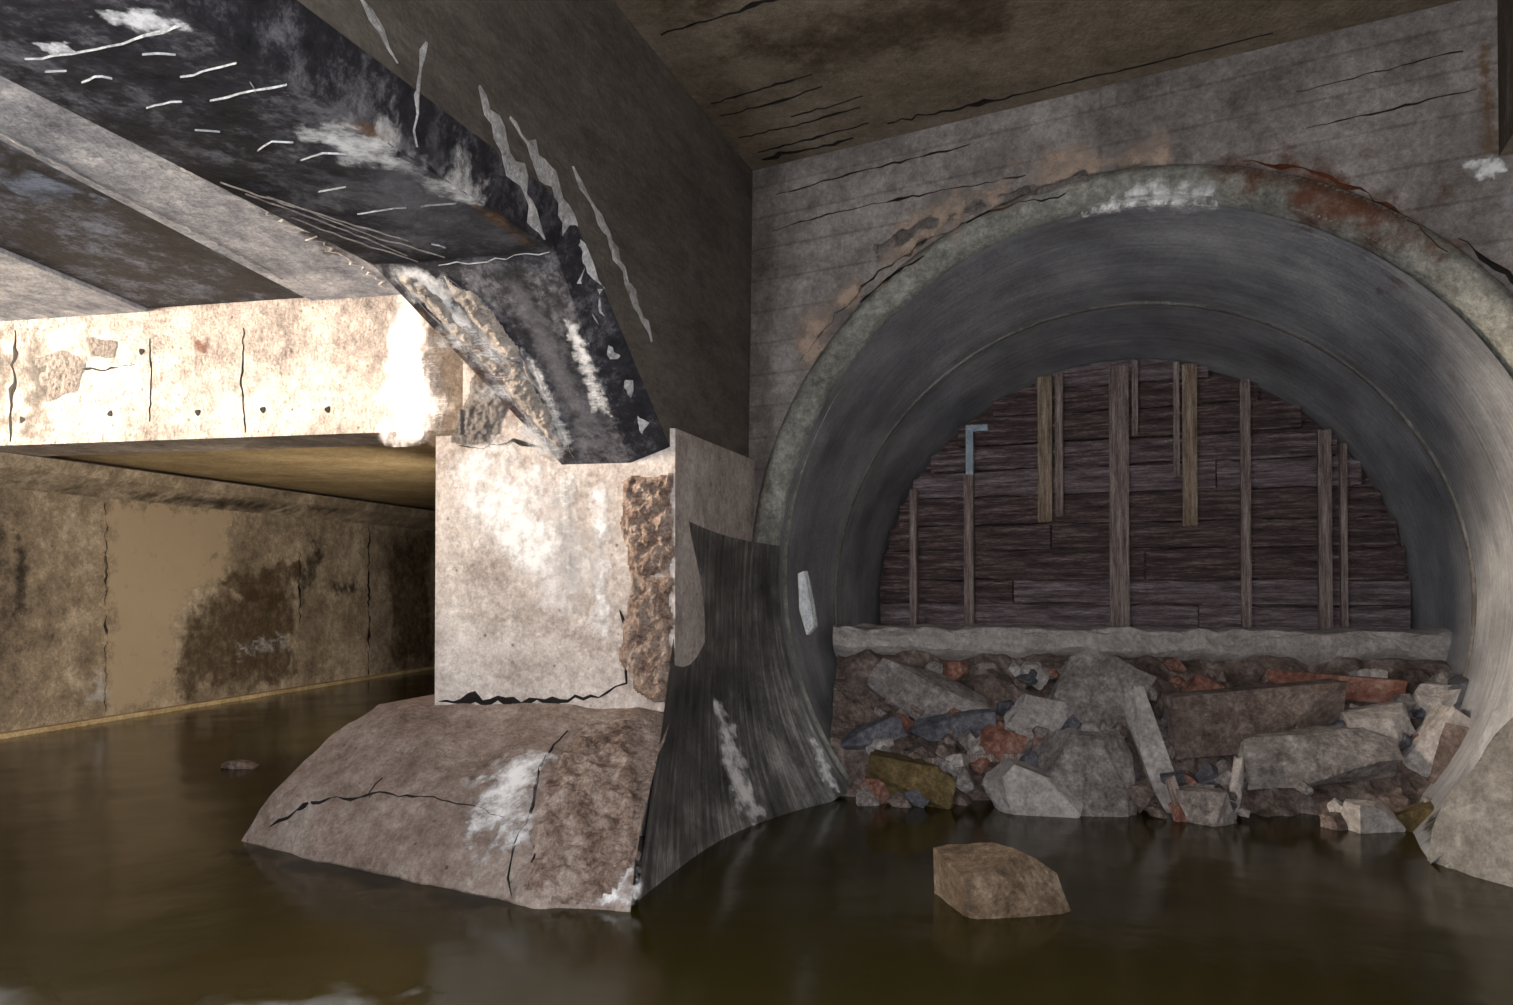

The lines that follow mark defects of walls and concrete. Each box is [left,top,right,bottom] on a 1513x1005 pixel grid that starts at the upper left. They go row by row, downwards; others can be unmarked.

leakage [0,133,282,279]
leakage [210,82,287,102]
leakage [257,41,478,228]
leakage [360,0,398,63]
crack [660,0,778,36]
corrosion [1228,156,1448,252]
crack [9,330,18,441]
peeling [220,182,575,459]
leakage [259,85,653,636]
leakage [176,540,323,699]
crack [270,610,633,896]
leakage [469,753,552,846]